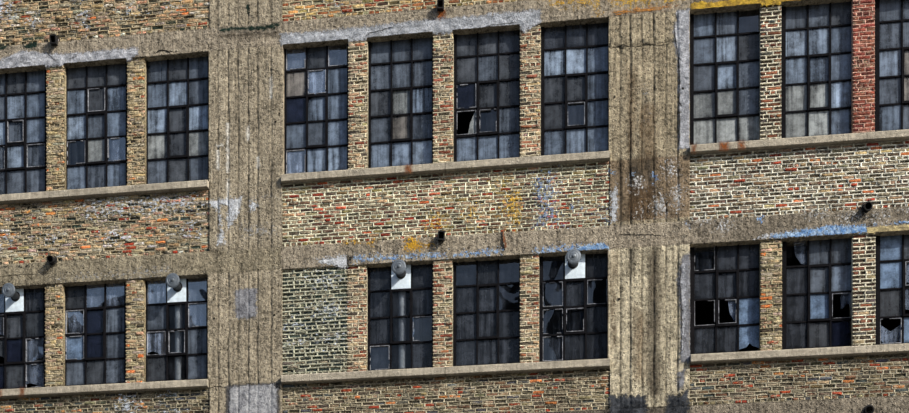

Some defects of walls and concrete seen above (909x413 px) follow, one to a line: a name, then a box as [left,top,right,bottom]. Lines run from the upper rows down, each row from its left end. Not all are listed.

damp [621,156,653,218]
peeling [208,196,277,246]
peeling [838,203,909,233]